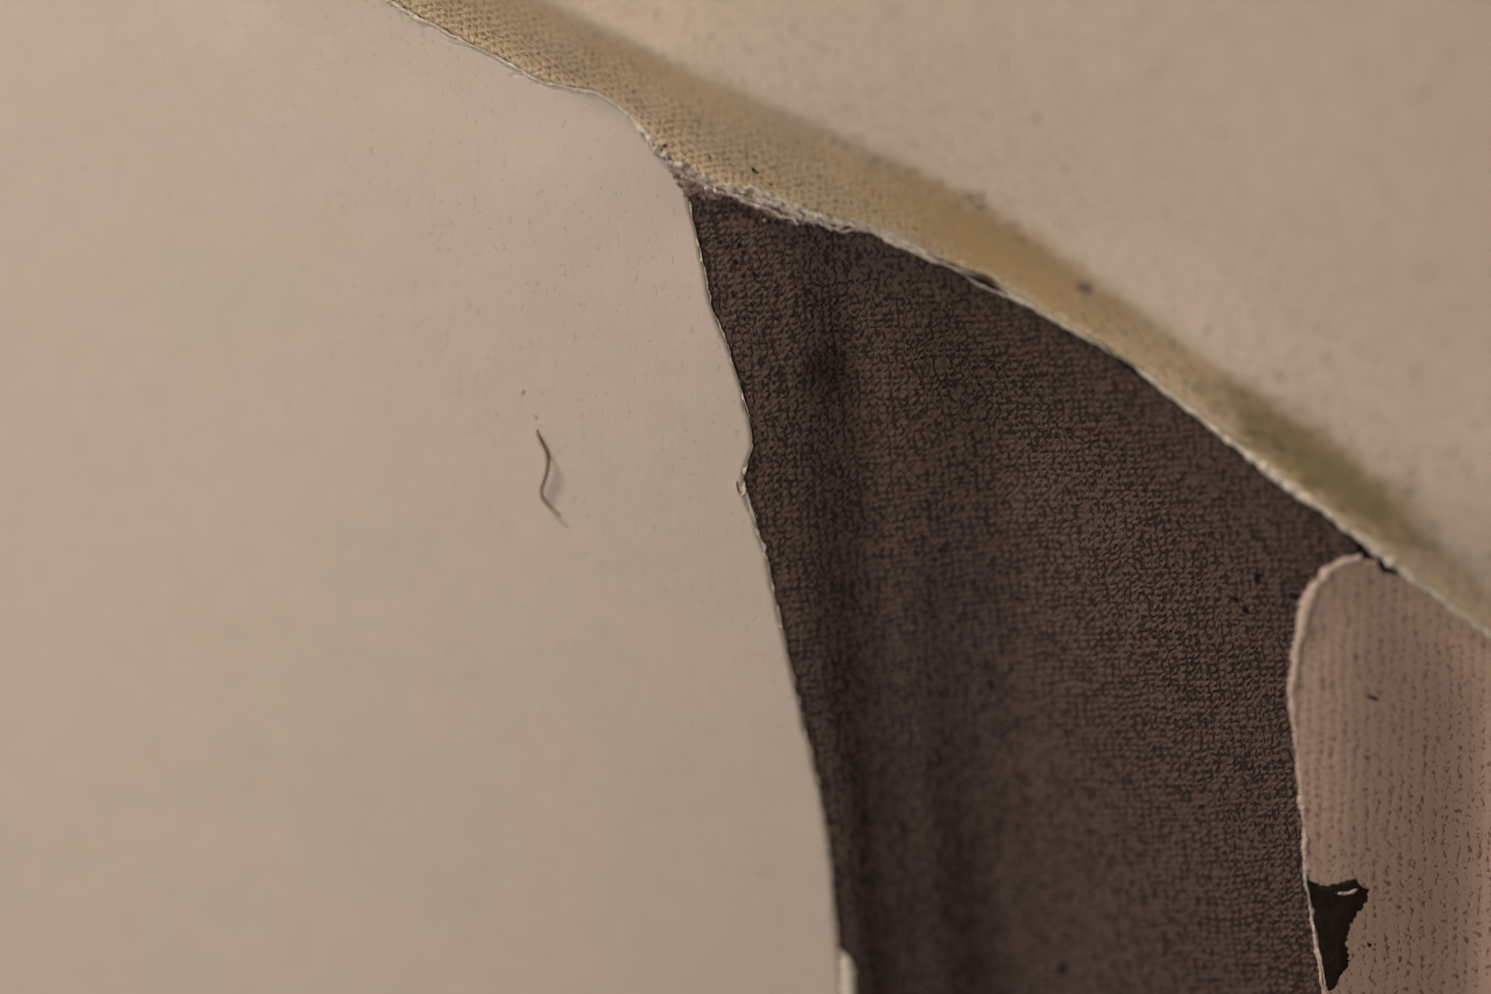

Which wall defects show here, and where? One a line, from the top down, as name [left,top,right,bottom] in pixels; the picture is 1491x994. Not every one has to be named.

spalling [640,133,943,258]
peeling [838,949,856,994]
peeling [1303,871,1370,992]